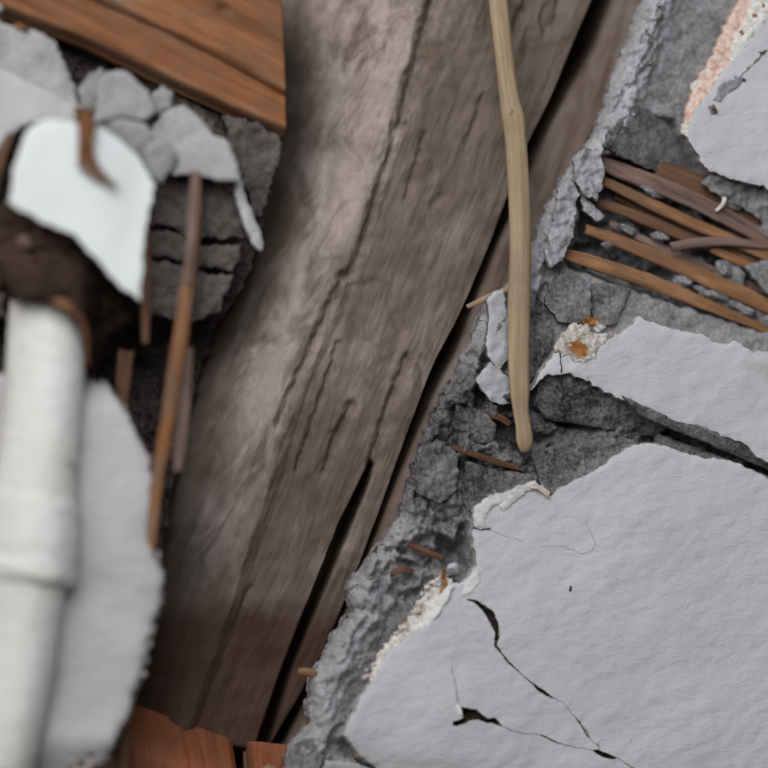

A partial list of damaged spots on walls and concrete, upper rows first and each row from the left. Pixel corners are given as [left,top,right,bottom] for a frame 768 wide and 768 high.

crack [739,49,768,82]
flaking render [0,40,282,470]
flaking render [282,0,768,768]
rust [554,317,614,363]
flaking render [155,417,176,574]
crack [452,599,634,768]